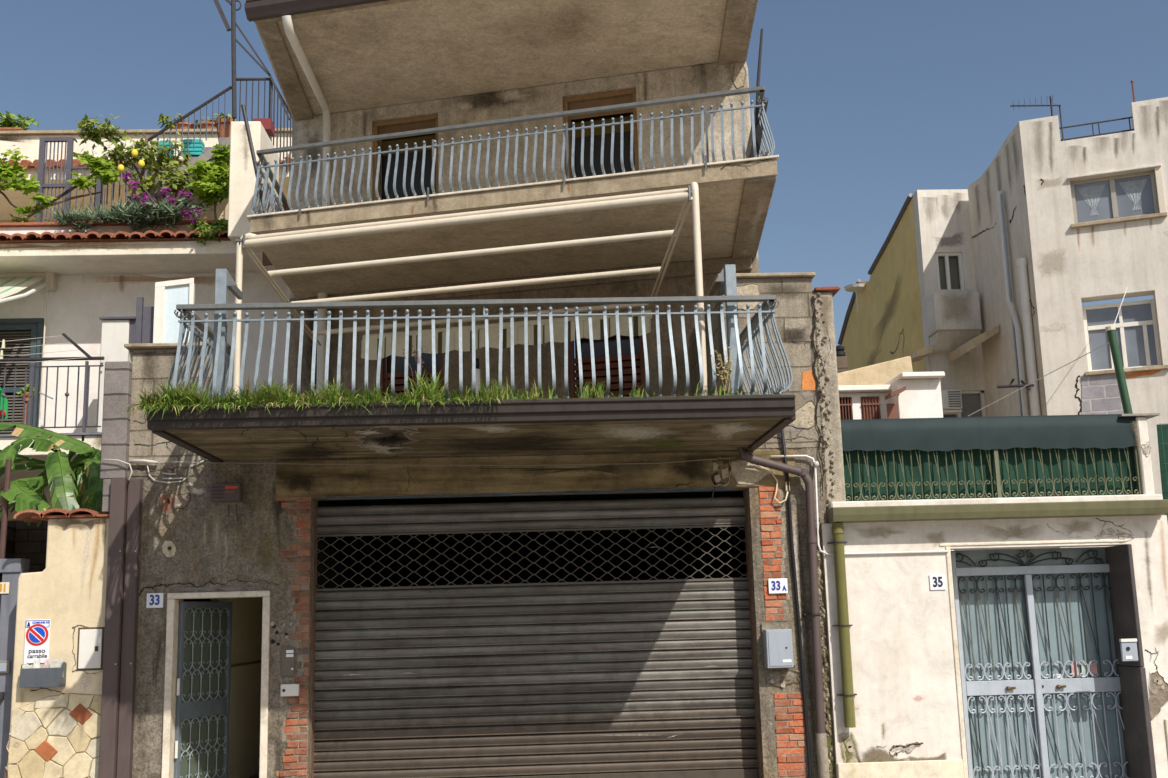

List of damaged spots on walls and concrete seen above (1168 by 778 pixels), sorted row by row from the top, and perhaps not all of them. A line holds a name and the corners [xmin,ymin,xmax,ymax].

water stain [466,426,554,451]
water stain [608,428,662,439]
water stain [716,424,749,437]
crack [774,290,836,778]
crack [139,579,279,596]
spalling [1148,648,1168,720]
spalling [889,741,923,756]